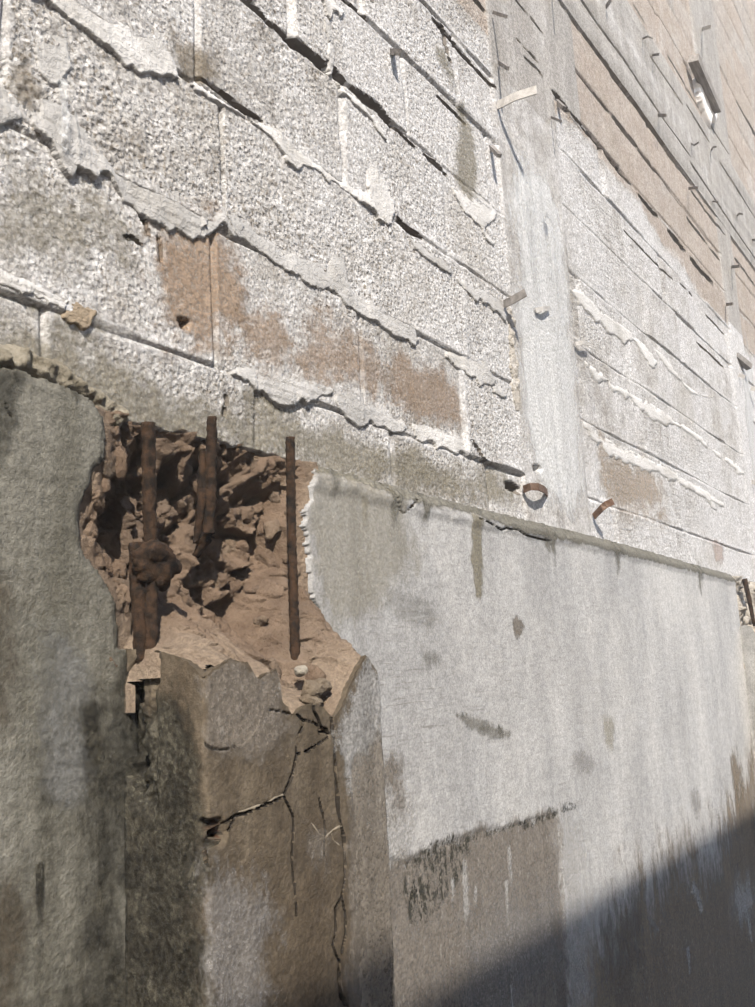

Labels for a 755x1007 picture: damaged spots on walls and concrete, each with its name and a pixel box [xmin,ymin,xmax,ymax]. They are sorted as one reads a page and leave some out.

peeling [157,231,288,360]
spalling [0,344,144,667]
peeling [598,434,663,520]
spalling [125,430,361,721]
spalling [732,576,755,632]
damp [35,862,44,907]
damp [63,650,270,1007]
crack [204,742,237,752]
damp [204,662,286,757]
crack [215,705,349,1007]
damp [384,753,404,817]
damp [390,748,755,1007]